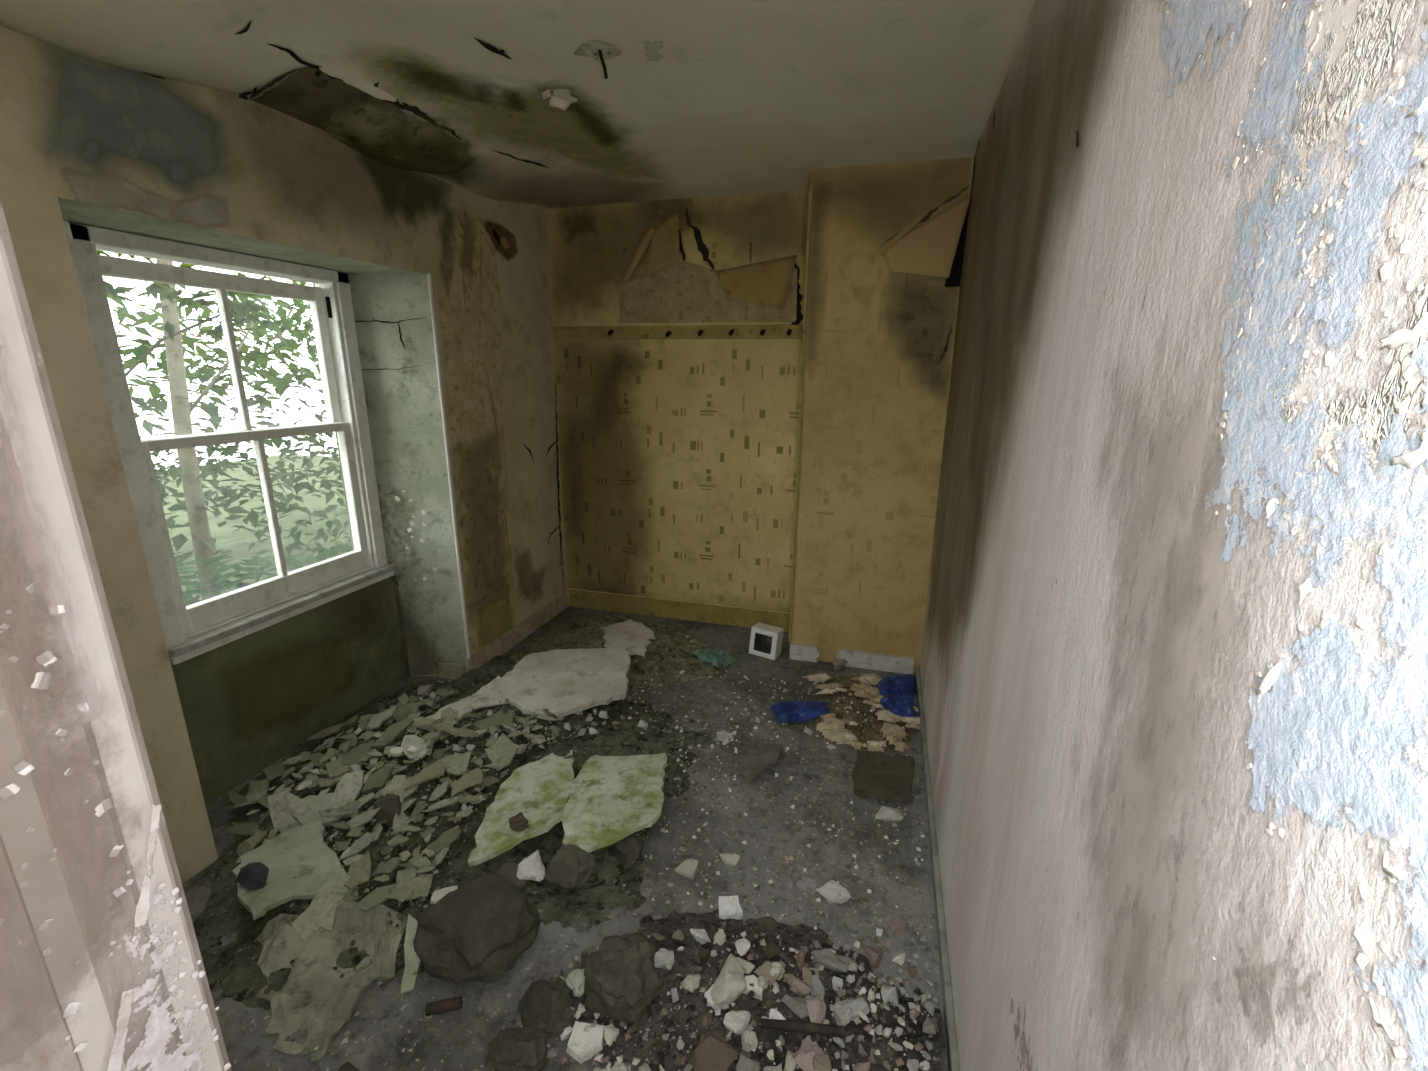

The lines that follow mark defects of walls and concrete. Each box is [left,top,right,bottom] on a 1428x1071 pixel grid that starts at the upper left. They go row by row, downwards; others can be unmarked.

damp [51,56,219,185]
crack [235,20,549,168]
damp [343,132,471,214]
damp [376,59,649,174]
spalling [482,221,518,260]
crack [355,317,426,370]
damp [896,0,1110,647]
peeling [1154,0,1428,1071]
peeling [8,650,57,690]
damp [1096,409,1231,1011]
peeling [0,759,34,800]
peeling [106,804,231,1071]